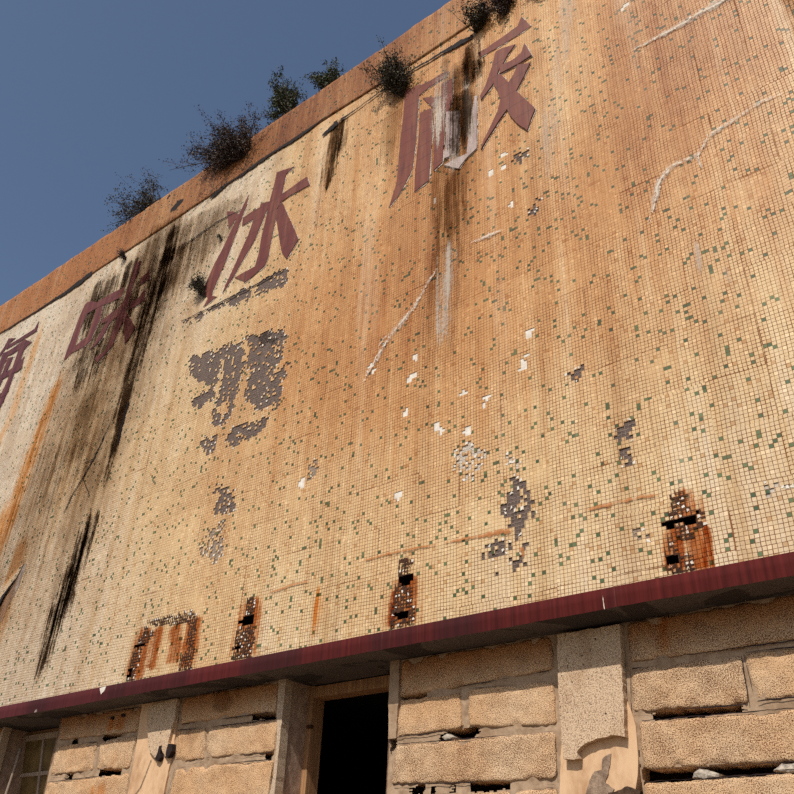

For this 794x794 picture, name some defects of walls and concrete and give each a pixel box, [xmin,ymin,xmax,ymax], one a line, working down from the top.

crack [635,0,724,49]
leakage [320,120,348,190]
leakage [432,40,484,162]
crack [649,89,787,220]
leakage [72,224,179,480]
peeling [183,267,289,325]
peeling [188,328,292,456]
leakage [436,246,451,337]
peeling [199,483,236,565]
peeling [482,452,537,572]
leakage [32,511,104,688]
spalling [586,754,643,794]